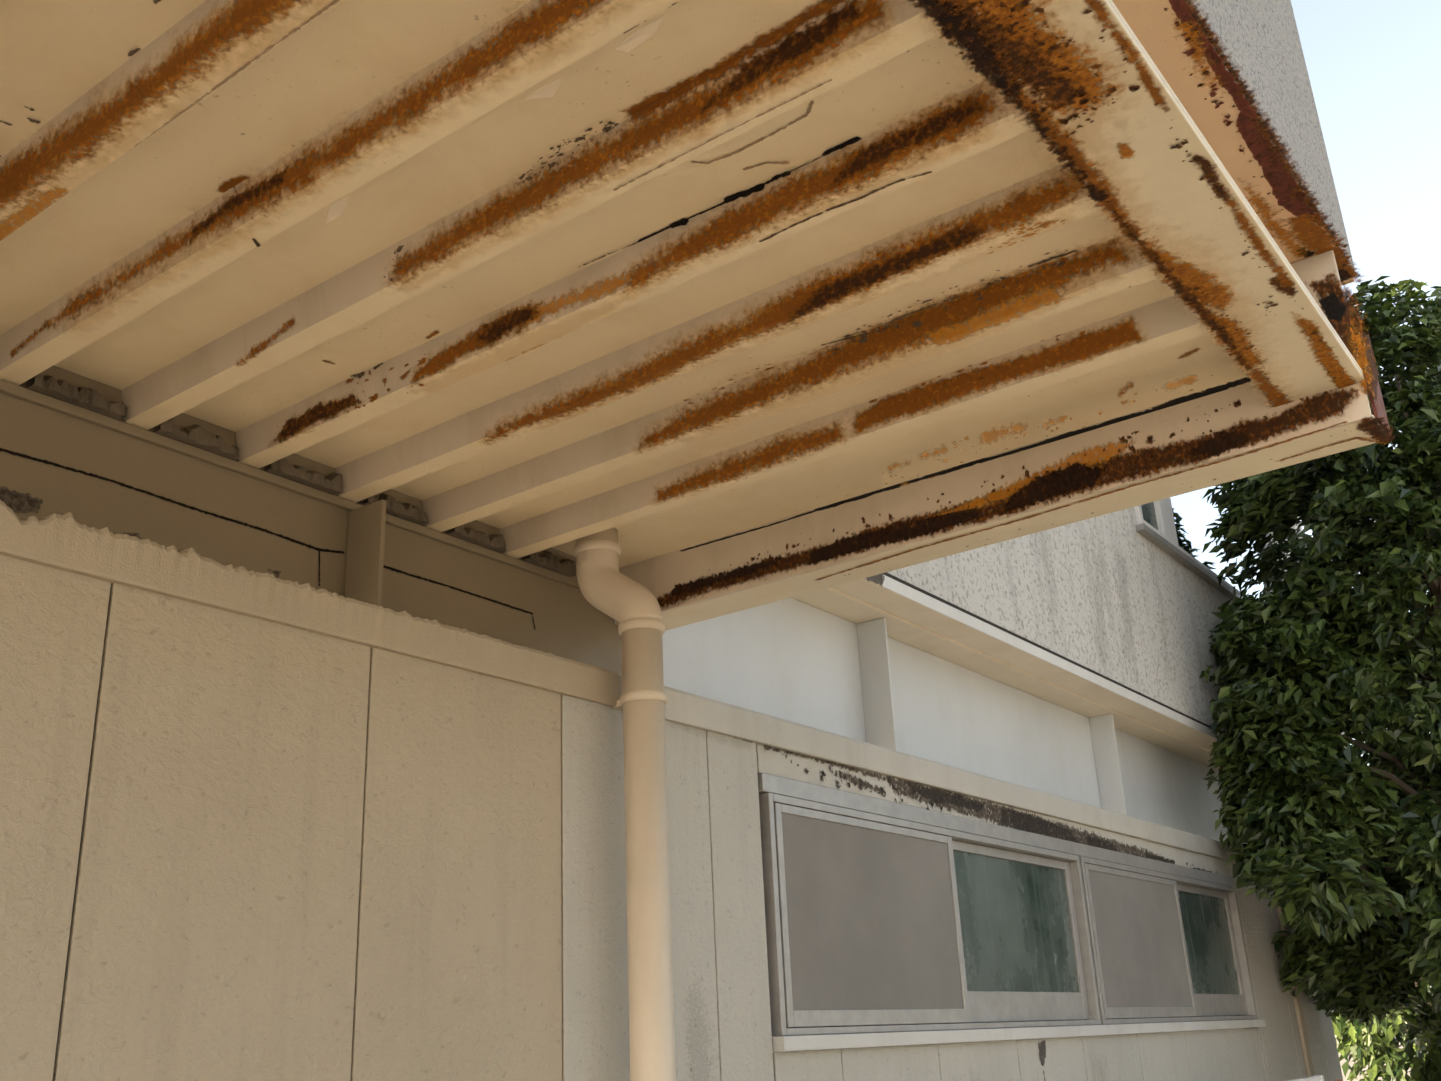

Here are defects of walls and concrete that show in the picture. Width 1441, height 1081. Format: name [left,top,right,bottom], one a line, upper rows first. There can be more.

rust [0,0,603,357]
crack [579,137,861,267]
rust [237,319,294,366]
rust [274,0,1394,608]
spalling [0,487,63,515]
crack [0,448,344,586]
crack [383,565,535,630]